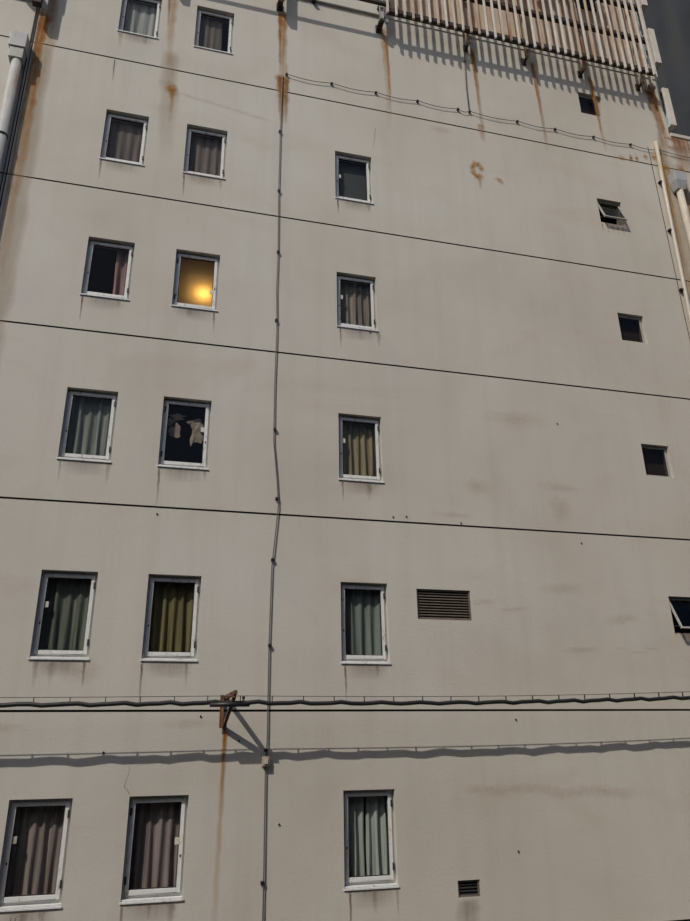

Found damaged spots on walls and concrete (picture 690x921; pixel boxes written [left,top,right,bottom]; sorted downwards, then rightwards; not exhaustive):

rust [15,14,51,147]
rust [277,76,288,105]
rust [621,152,673,212]